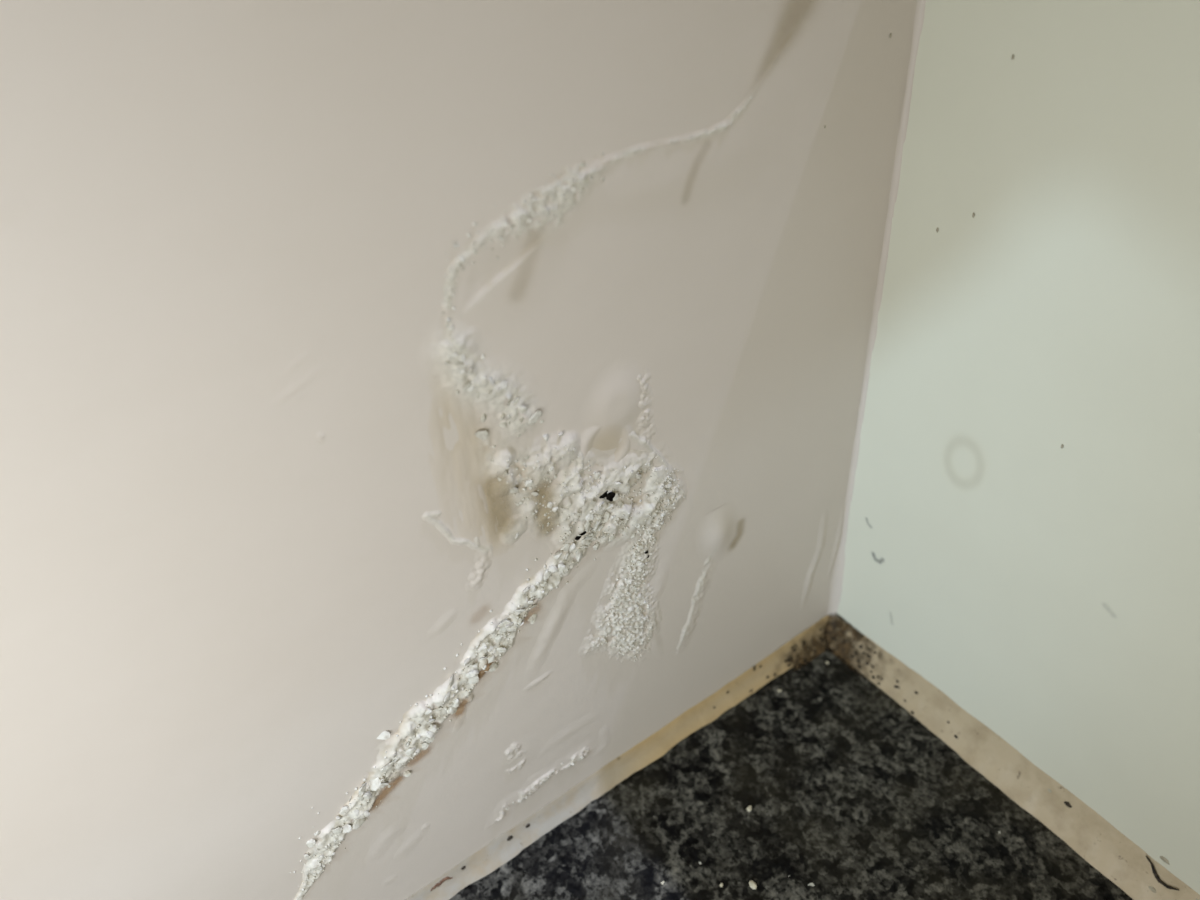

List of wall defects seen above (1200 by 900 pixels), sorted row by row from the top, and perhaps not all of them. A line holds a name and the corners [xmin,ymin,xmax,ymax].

water stain [290,468,685,900]
water stain [753,614,918,714]